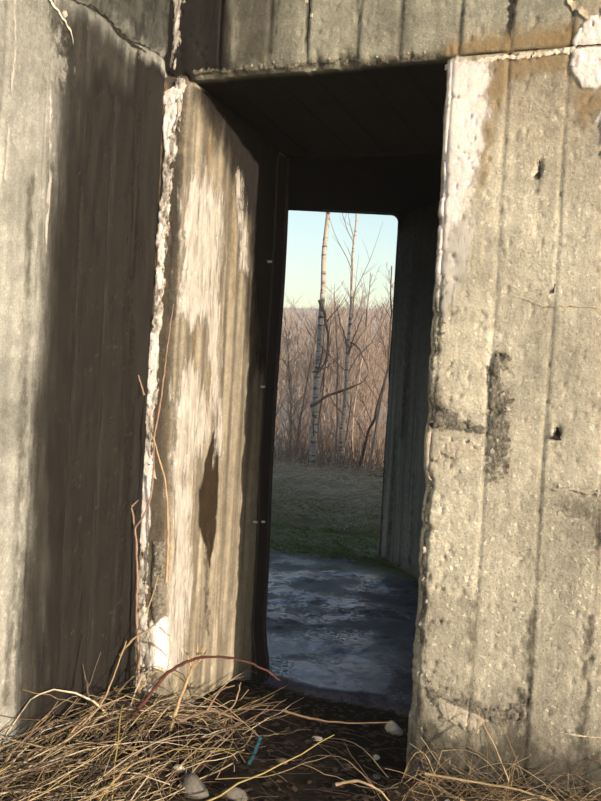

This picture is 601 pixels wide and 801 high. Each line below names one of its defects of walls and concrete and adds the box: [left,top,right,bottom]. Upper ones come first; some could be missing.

crack [36,0,163,58]
water stain [0,0,280,750]
spalling [417,291,517,644]
water stain [409,610,601,801]